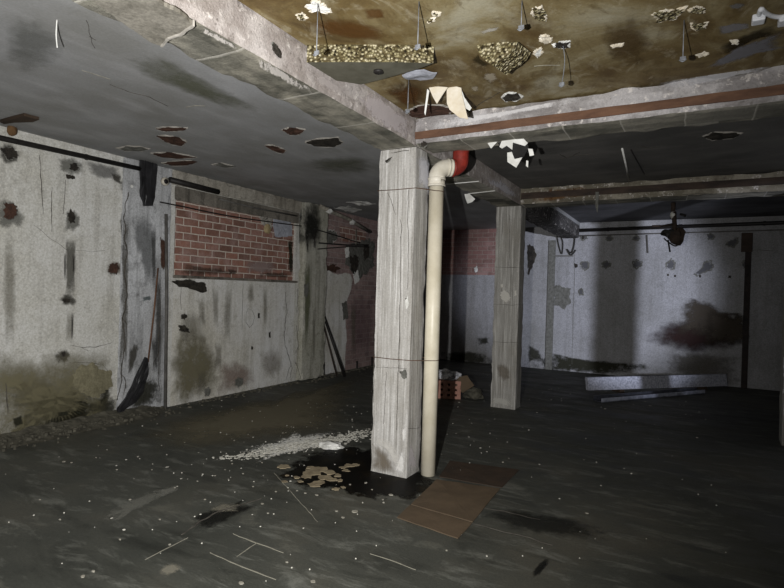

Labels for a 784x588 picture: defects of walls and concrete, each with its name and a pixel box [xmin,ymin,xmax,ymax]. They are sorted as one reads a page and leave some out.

spalling [116,126,197,166]
damp [64,244,75,289]
crack [72,192,129,400]
flaking render [172,279,207,293]
damp [659,300,743,375]
damp [529,347,645,374]
damp [0,360,114,434]